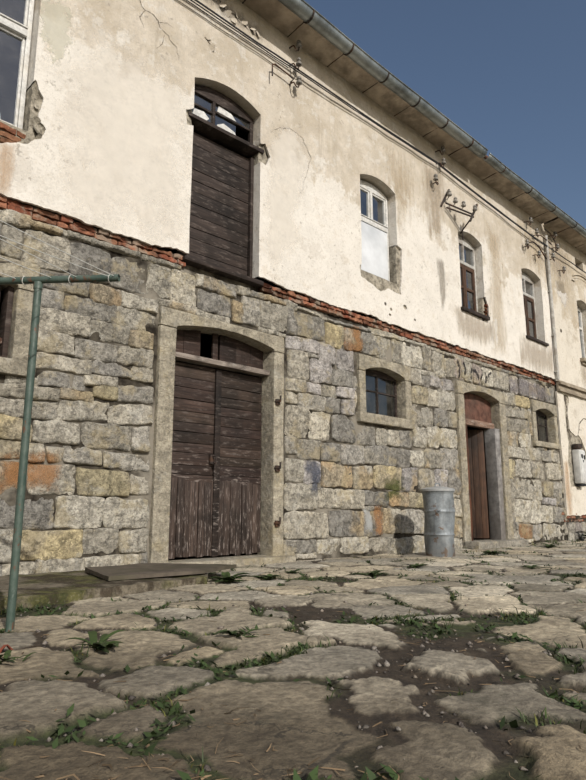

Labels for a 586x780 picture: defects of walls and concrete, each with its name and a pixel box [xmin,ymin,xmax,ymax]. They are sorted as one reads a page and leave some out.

peeling [216,0,260,37]
spalling [0,81,45,144]
spalling [360,246,400,294]